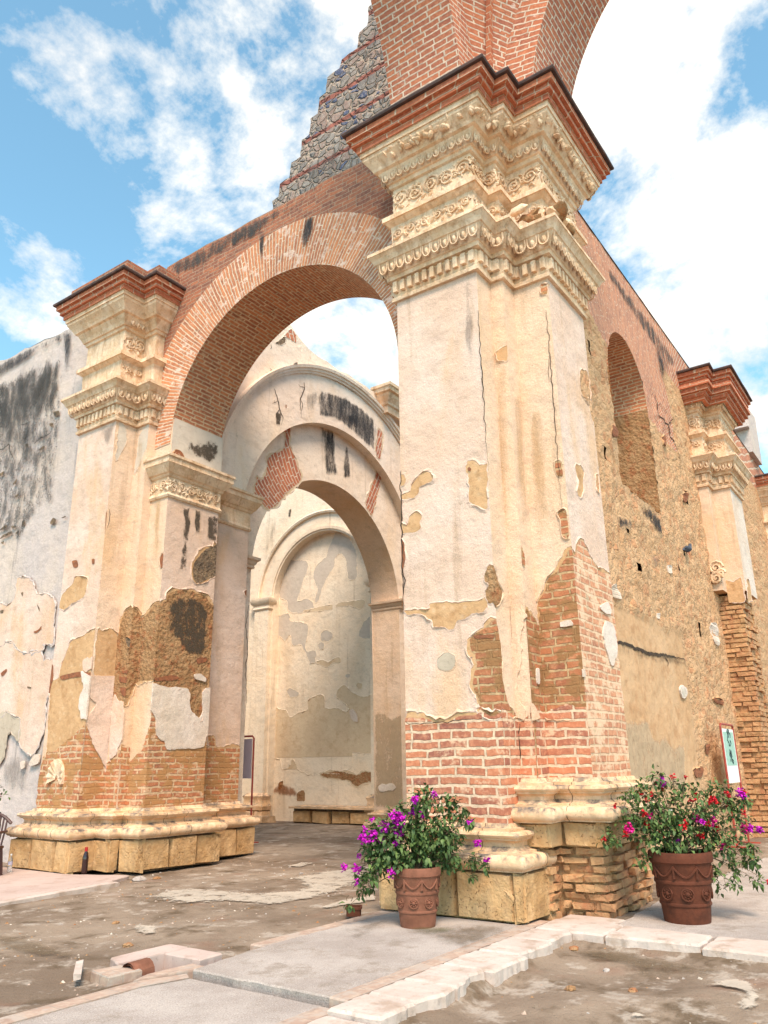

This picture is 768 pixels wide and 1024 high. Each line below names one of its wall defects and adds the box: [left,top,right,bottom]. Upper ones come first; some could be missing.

damp [303,218,313,244]
damp [0,361,57,460]
damp [189,441,217,462]
flaking render [252,428,303,512]
damp [319,392,374,446]
flaking render [400,468,436,537]
flaking render [465,458,489,513]
crack [478,312,489,471]
crack [546,317,561,498]
flaking render [0,541,240,809]
damp [170,599,207,654]
flaking render [275,507,684,824]